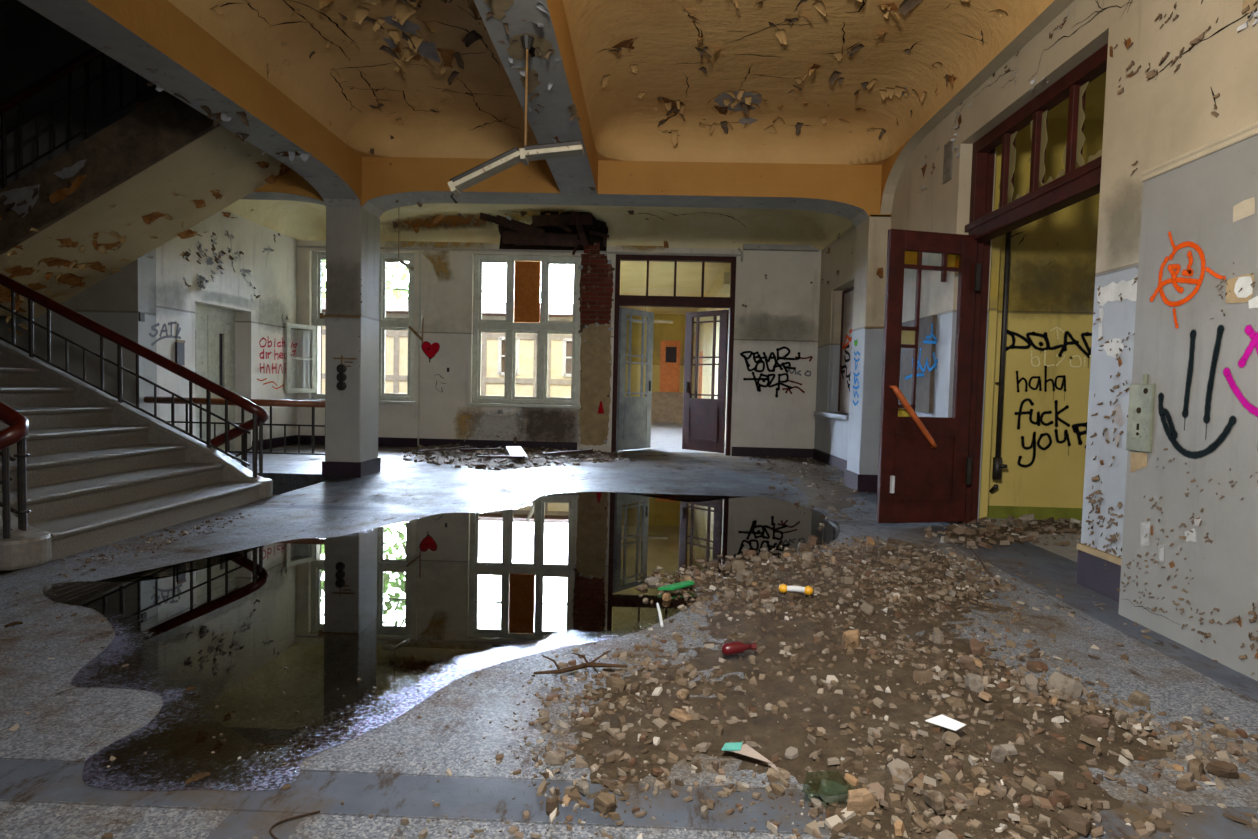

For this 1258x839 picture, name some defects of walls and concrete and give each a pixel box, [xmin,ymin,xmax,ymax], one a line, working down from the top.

crack [211,0,521,131]
peeling [353,0,483,102]
peeling [441,0,562,113]
peeling [597,37,638,53]
crack [678,0,891,97]
peeling [638,62,956,147]
peeling [578,242,615,446]
peeling [1083,262,1258,675]